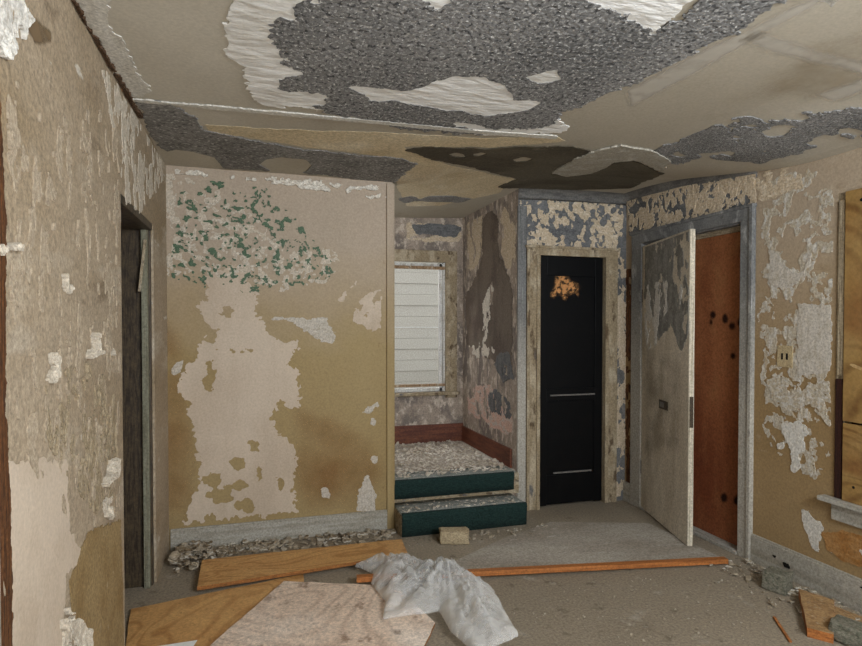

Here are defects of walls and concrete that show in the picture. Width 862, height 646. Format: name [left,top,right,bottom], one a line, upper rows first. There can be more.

spalling [268,0,787,136]
peeling [0,70,418,646]
spalling [405,107,862,497]
peeling [801,509,862,567]